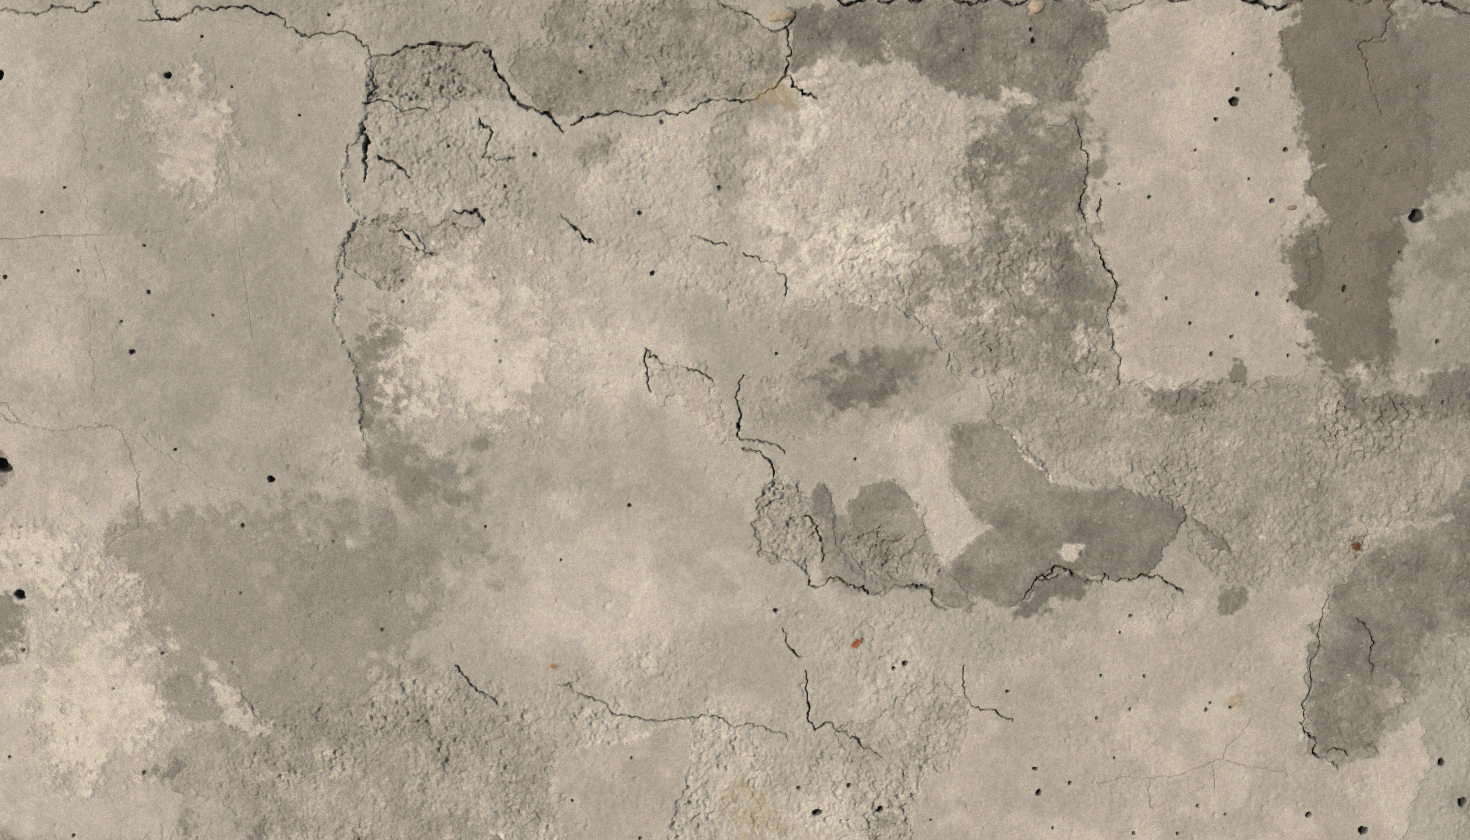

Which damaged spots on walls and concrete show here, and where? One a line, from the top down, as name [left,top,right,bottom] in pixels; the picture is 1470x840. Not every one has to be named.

crack [838,0,1191,14]
crack [1241,0,1304,12]
crack [138,0,819,183]
crack [454,208,487,226]
crack [561,213,595,245]
crack [690,235,788,297]
crack [1074,116,1123,387]
crack [643,348,787,480]
spalling [344,0,1470,766]
crack [456,665,499,705]
crack [559,629,911,780]
crack [1097,595,1378,810]